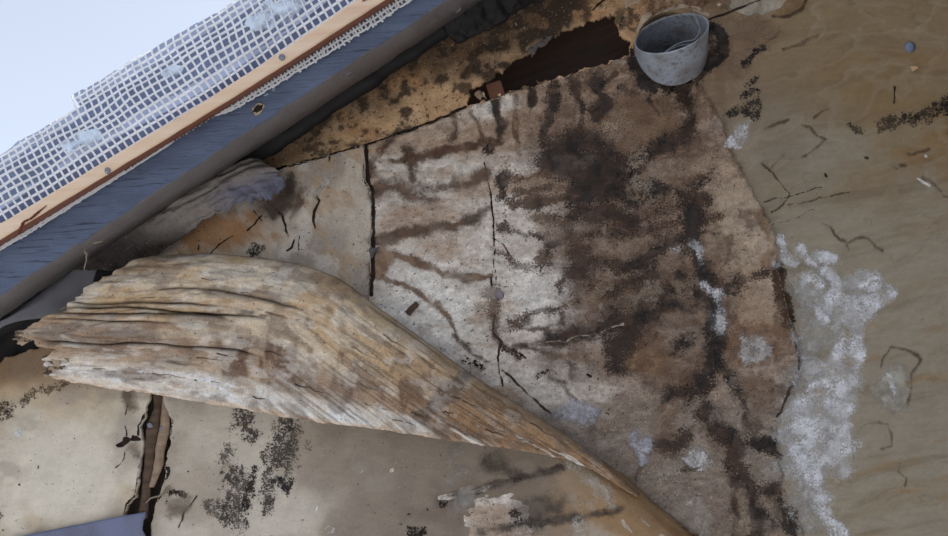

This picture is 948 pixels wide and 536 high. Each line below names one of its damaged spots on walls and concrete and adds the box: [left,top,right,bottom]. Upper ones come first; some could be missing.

peeling [623,0,807,34]
crack [198,185,322,254]
crack [276,105,467,297]
damp [364,97,520,203]
crack [483,162,511,286]
damp [368,207,493,362]
damp [478,21,897,536]
crack [461,314,551,414]
damp [202,408,312,536]
damp [397,513,427,536]
damp [426,458,564,511]